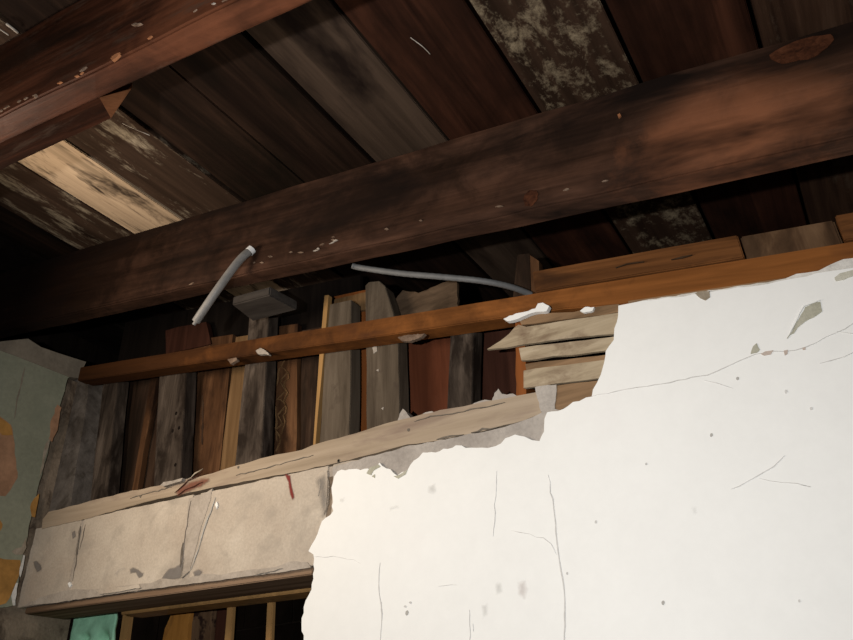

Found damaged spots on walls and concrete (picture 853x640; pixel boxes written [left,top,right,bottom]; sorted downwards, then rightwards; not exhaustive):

flaking render [835,270,853,281]
flaking render [398,334,427,343]
flaking render [504,303,551,323]
crack [594,323,853,396]
flaking render [751,343,773,356]
flaking render [787,300,822,339]
crack [493,471,566,640]
crack [316,556,383,640]